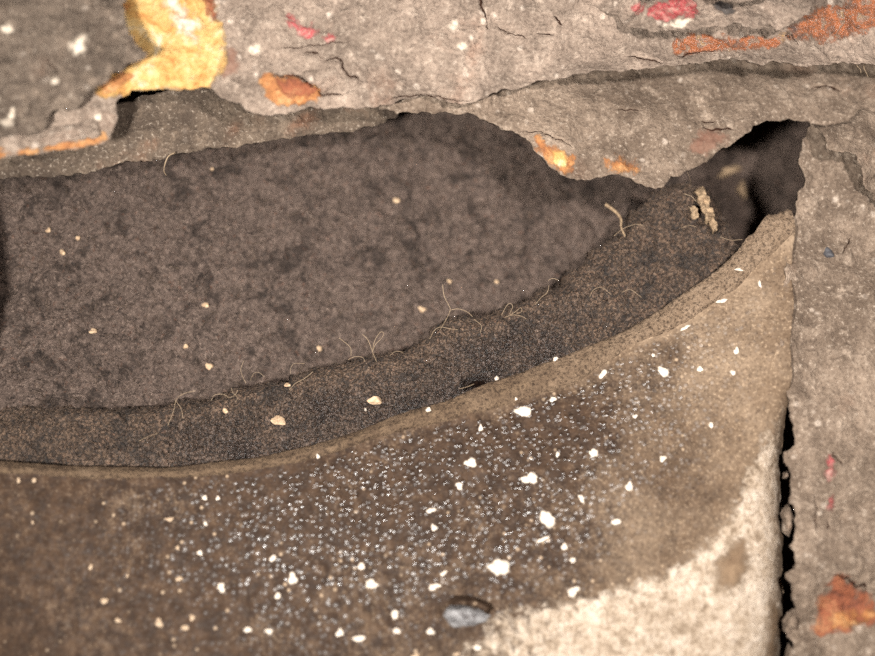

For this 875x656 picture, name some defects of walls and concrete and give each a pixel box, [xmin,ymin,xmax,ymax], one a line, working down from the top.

corrosion [598,0,875,55]
corrosion [0,0,227,157]
corrosion [259,65,344,107]
crack [273,40,364,96]
crack [388,94,471,102]
crack [627,49,719,64]
crack [702,121,732,131]
water stain [719,538,745,587]
water stain [767,603,779,656]
corrosion [813,574,875,637]